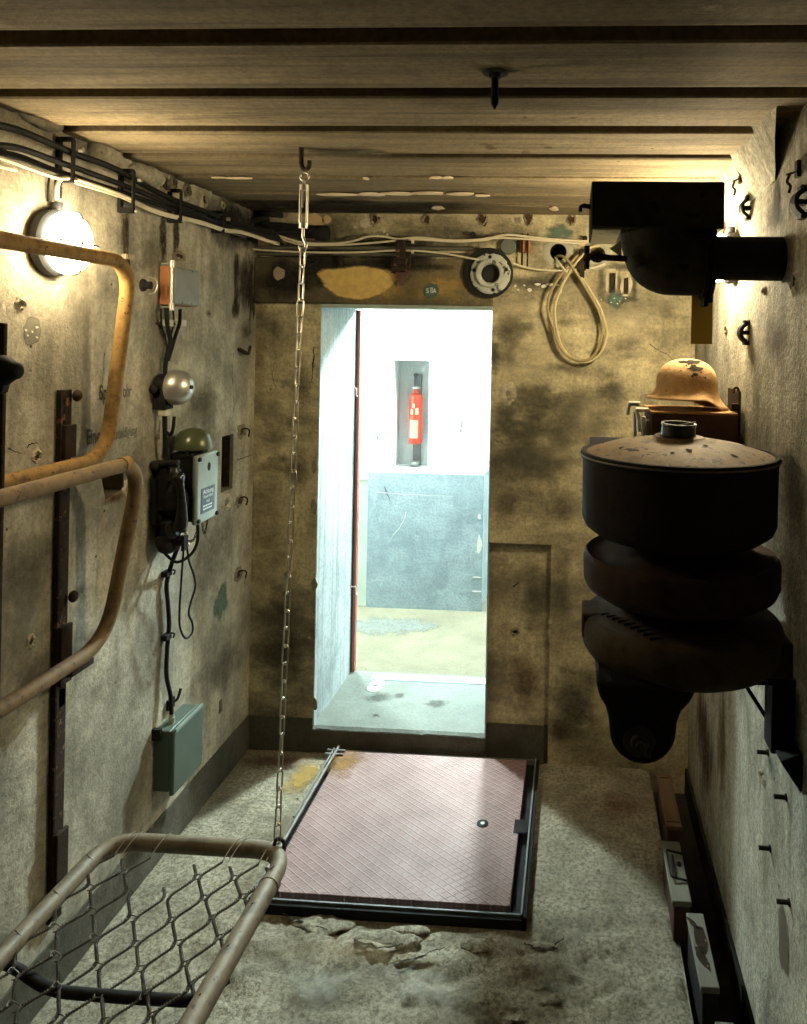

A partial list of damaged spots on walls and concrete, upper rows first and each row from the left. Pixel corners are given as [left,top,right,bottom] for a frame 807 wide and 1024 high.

damp [494,390,560,472]
damp [263,601,300,685]
corrosion [287,766,318,788]
spalling [293,914,494,965]